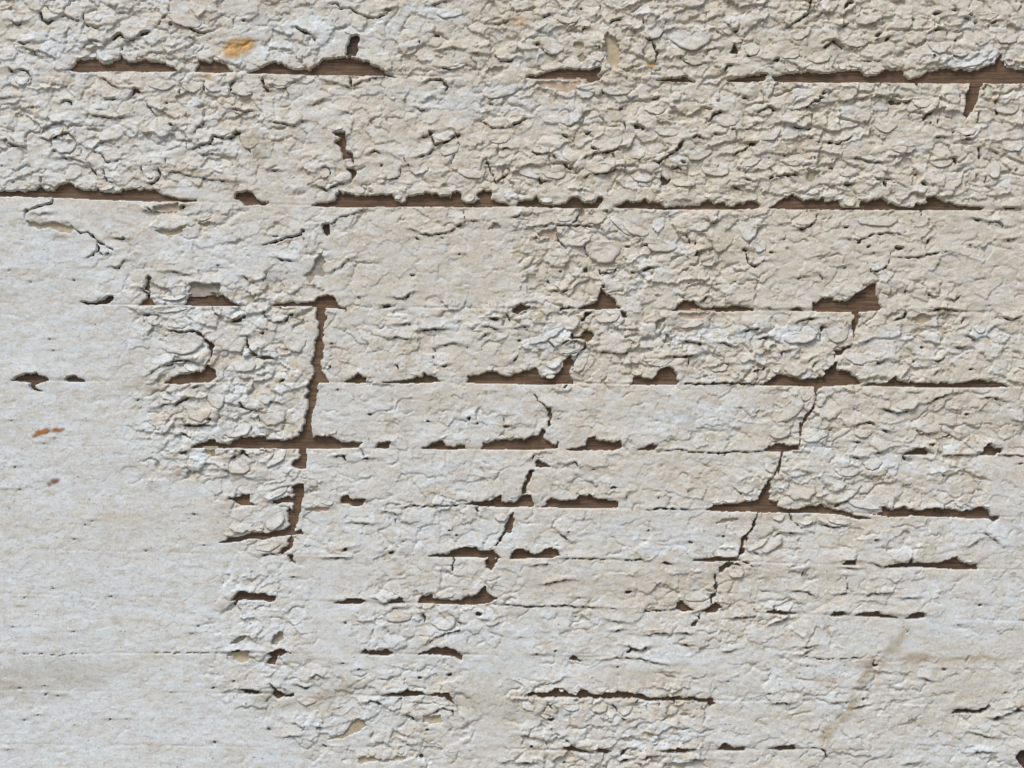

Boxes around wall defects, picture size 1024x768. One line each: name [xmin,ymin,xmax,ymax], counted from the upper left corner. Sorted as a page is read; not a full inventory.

peeling [40,11,392,104]
corrosion [225,38,253,57]
peeling [0,124,197,236]
peeling [313,0,1024,390]
peeling [141,272,368,505]
peeling [429,530,560,566]
peeling [469,486,627,521]
peeling [482,426,622,466]
crack [691,518,756,626]
crack [666,449,782,476]
crack [798,315,860,436]
peeling [693,275,1007,578]